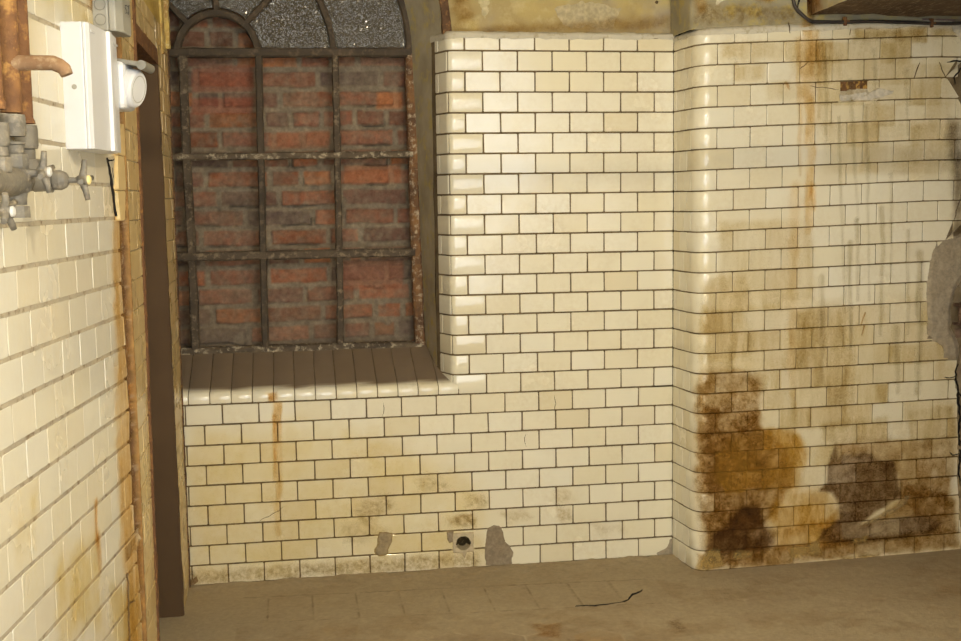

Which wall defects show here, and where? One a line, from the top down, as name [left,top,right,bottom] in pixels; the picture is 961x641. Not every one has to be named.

peeling [554,1,621,29]
crack [914,60,961,84]
spalling [838,81,894,103]
crack [575,590,642,607]